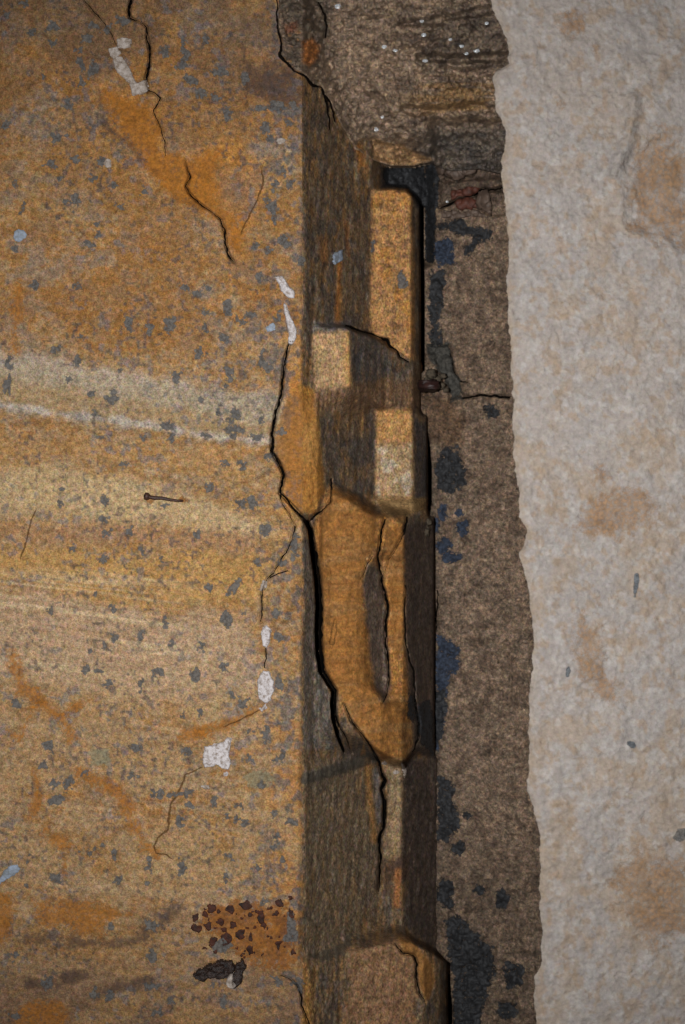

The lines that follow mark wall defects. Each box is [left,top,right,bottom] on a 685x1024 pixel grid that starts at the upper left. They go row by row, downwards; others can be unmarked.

crack [84,0,264,262]
crack [276,0,335,130]
crack [260,344,387,892]
crack [362,438,432,752]
crack [154,767,202,858]
corrosion [191,896,299,959]